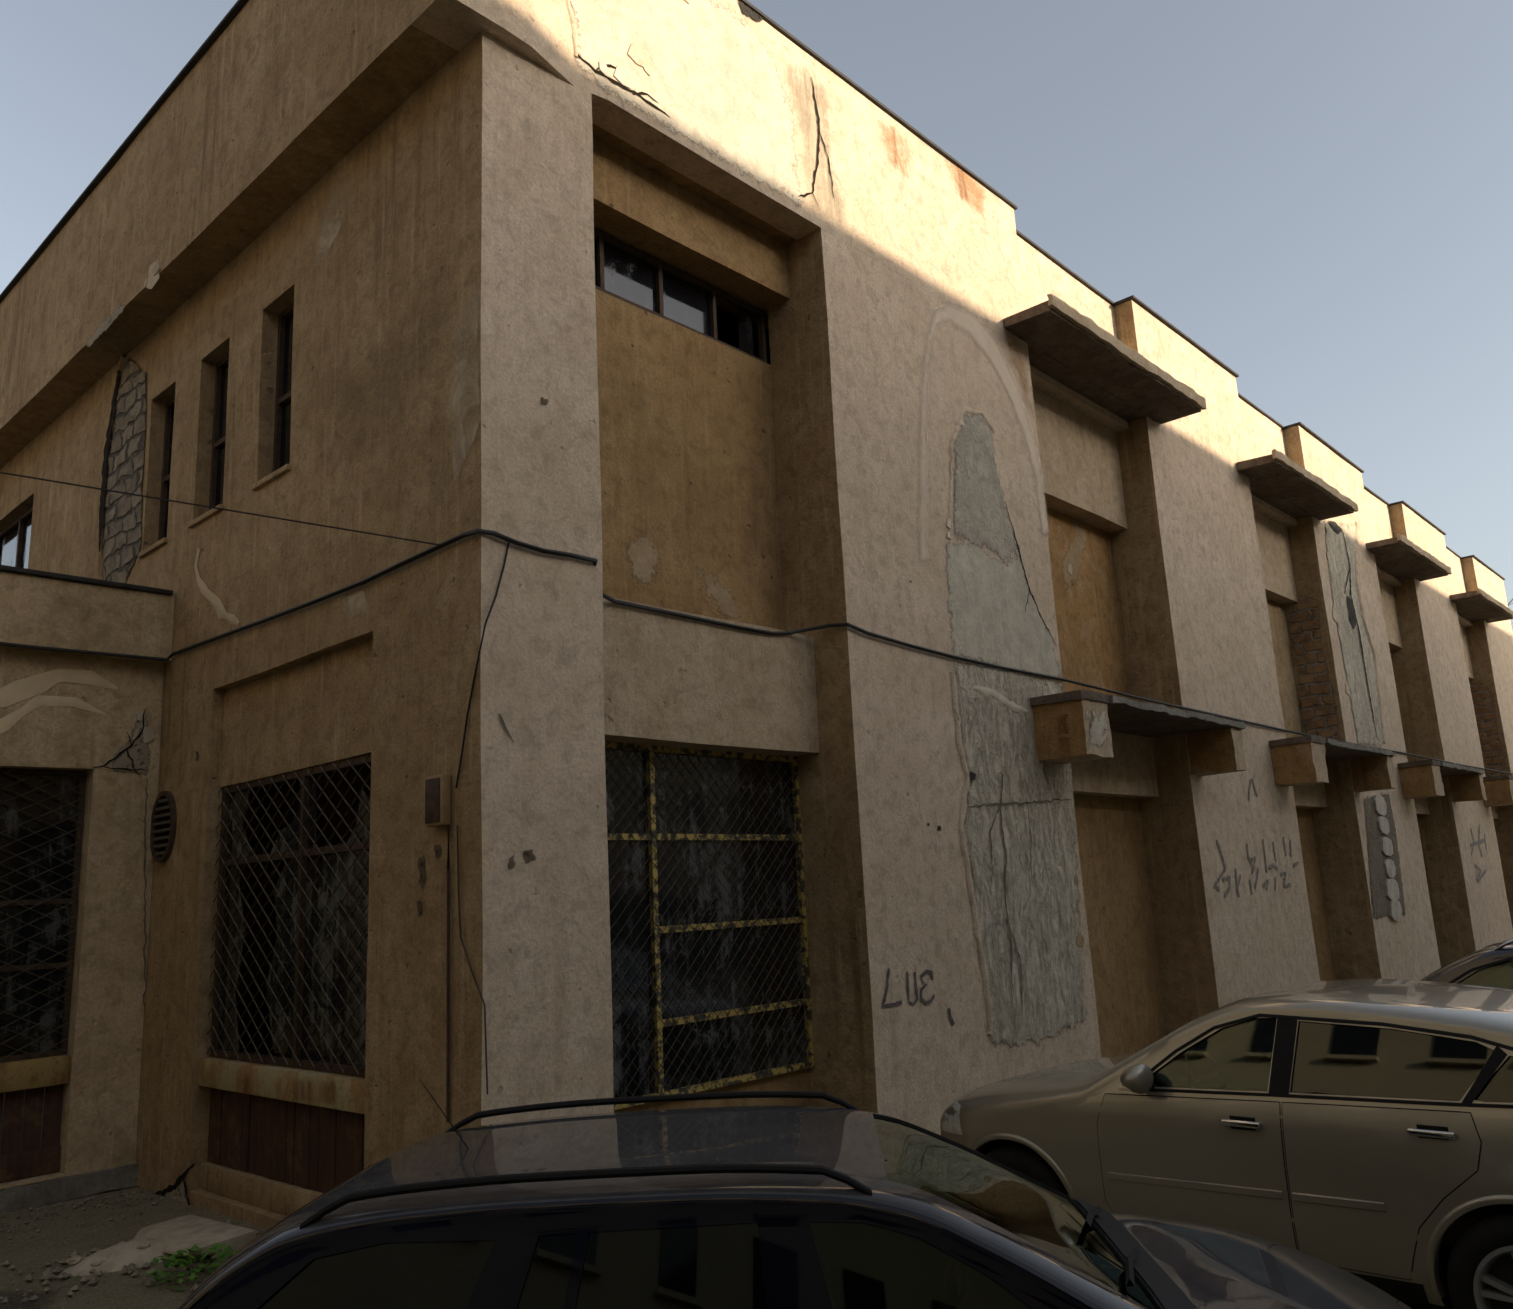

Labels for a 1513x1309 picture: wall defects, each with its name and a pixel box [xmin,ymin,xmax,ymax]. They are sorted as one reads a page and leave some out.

crack [578,54,670,117]
peeling [565,0,804,207]
crack [798,77,834,205]
flaking render [96,356,146,583]
spalling [1288,520,1386,747]
crack [1343,533,1377,736]
crack [93,708,148,1010]
crack [967,761,1071,1013]
flaking render [1364,793,1405,921]